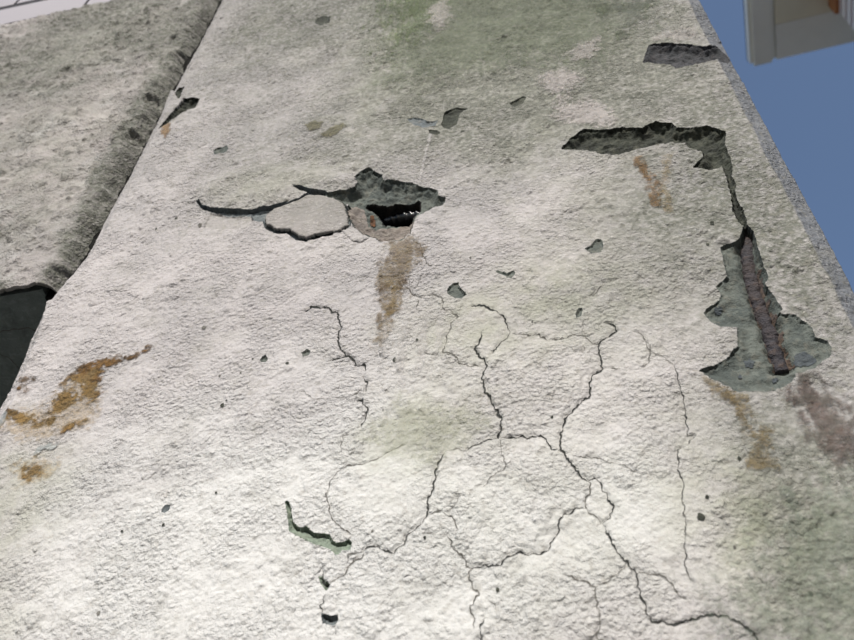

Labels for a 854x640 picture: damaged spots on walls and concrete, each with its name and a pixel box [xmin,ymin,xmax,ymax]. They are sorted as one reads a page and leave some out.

spalling [643,42,730,69]
flaking render [159,87,200,128]
spalling [408,107,467,135]
spalling [196,167,446,243]
spalling [561,121,832,392]
corrosion [6,345,151,434]
crack [301,240,758,640]
corrosion [21,465,43,481]
flaking render [285,500,352,555]